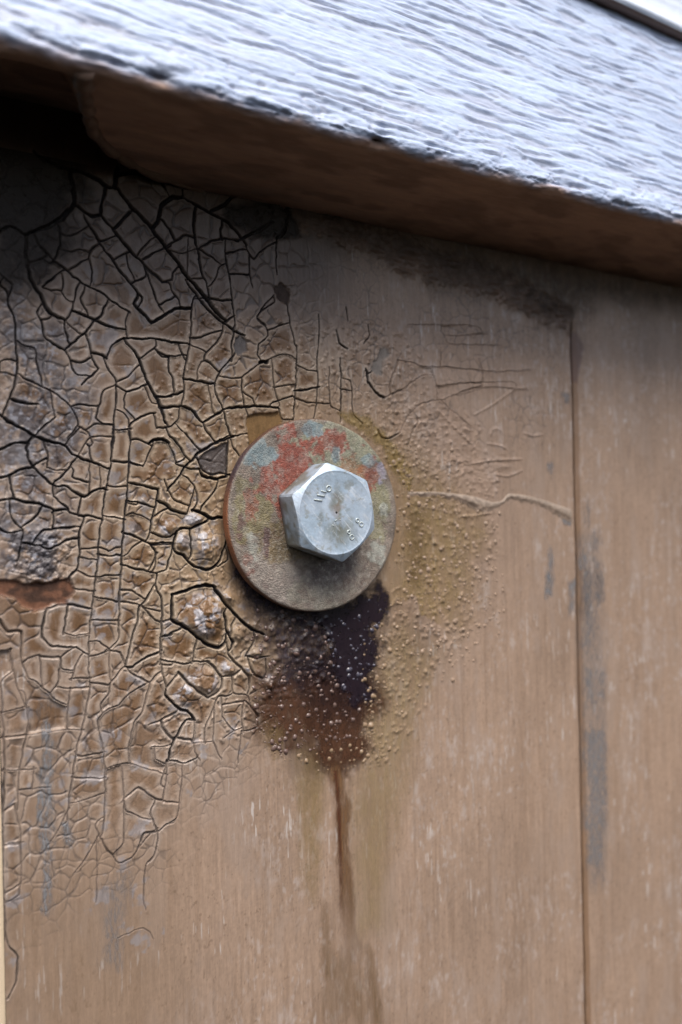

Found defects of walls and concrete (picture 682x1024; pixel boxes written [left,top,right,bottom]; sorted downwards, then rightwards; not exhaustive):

peeling [197,442,228,474]
crack [0,168,532,999]
corrosion [232,568,389,910]
corrosion [340,413,411,490]